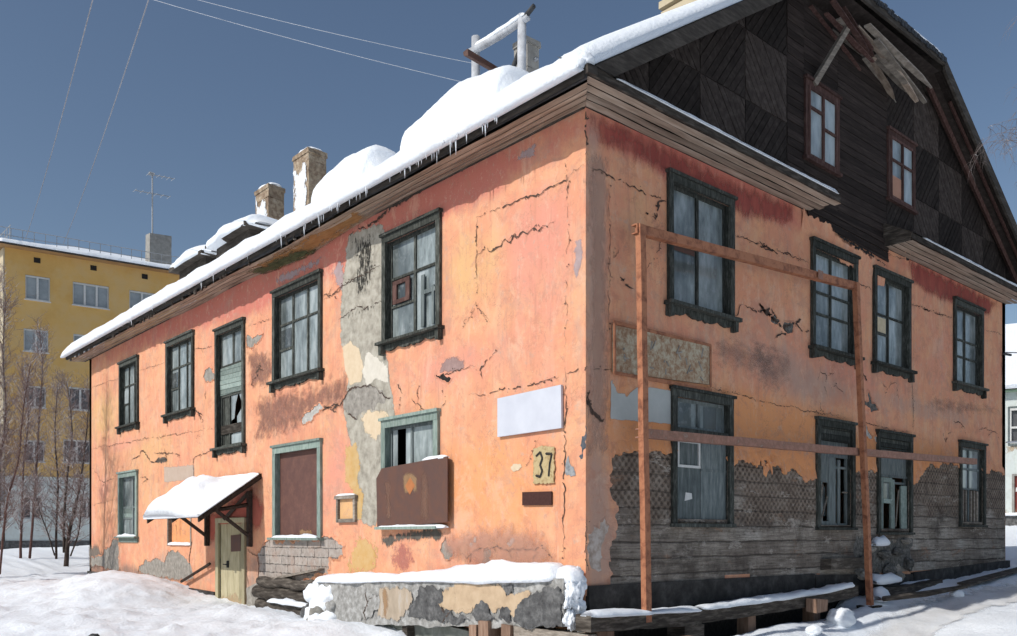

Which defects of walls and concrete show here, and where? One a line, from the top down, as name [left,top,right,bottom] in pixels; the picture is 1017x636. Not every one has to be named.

leakage [599,122,792,221]
crack [464,112,665,339]
leakage [249,354,271,384]
leakage [255,211,395,528]
spalling [342,341,389,440]
crack [735,304,809,338]
crack [91,391,212,506]
crack [322,349,611,571]
flaking render [256,533,379,581]
leakage [382,529,441,569]
spalling [356,583,564,629]
spalling [586,439,1005,585]